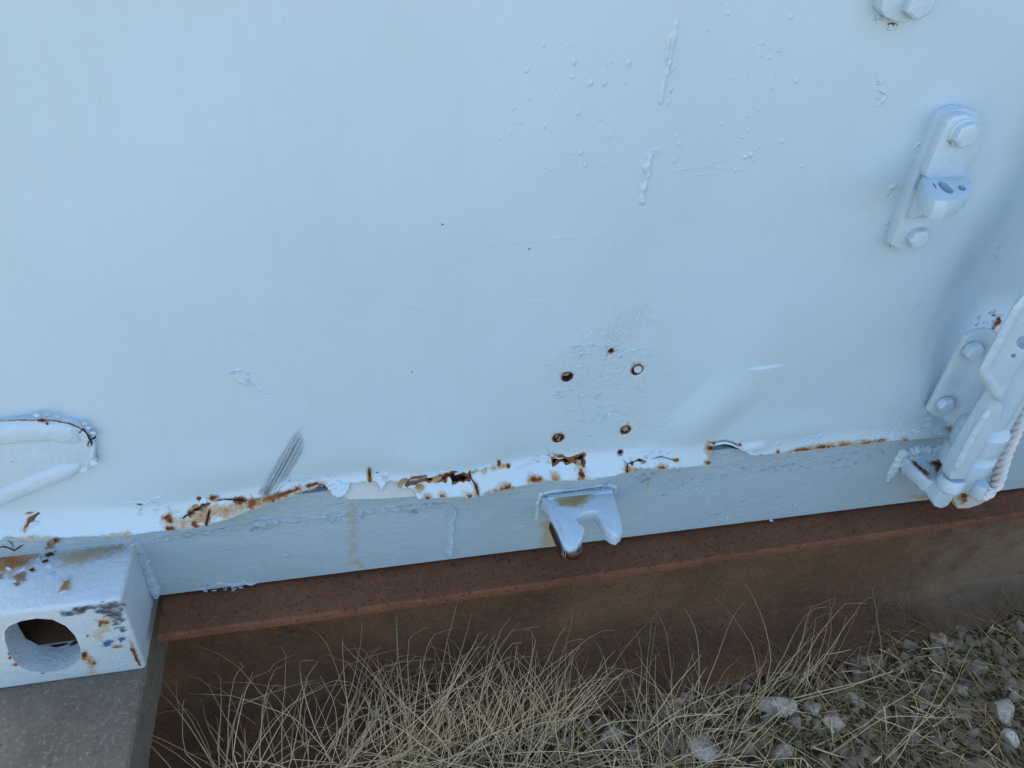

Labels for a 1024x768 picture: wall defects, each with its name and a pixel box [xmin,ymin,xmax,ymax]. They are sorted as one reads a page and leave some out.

corrosion [705,440,742,466]
corrosion [776,439,888,454]
corrosion [162,482,329,531]
peeling [375,464,497,490]
corrosion [466,460,514,498]
corrosion [529,473,561,483]
corrosion [557,468,591,507]
corrosion [0,512,61,572]
corrosion [58,575,73,597]
corrosion [49,620,109,673]